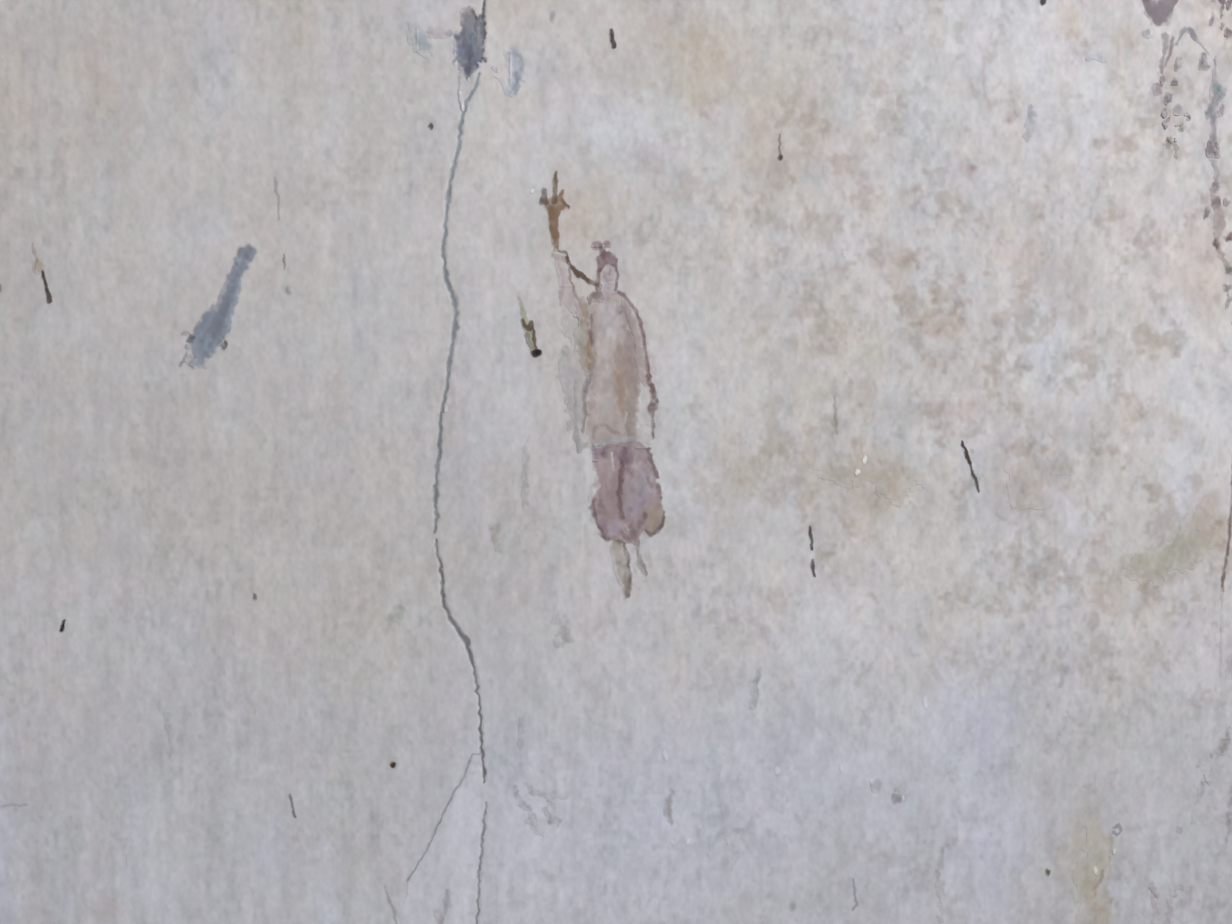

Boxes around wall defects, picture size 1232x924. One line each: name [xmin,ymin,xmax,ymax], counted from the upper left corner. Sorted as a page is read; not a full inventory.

damp [494,46,526,97]
damp [179,243,258,369]
crack [407,72,488,924]